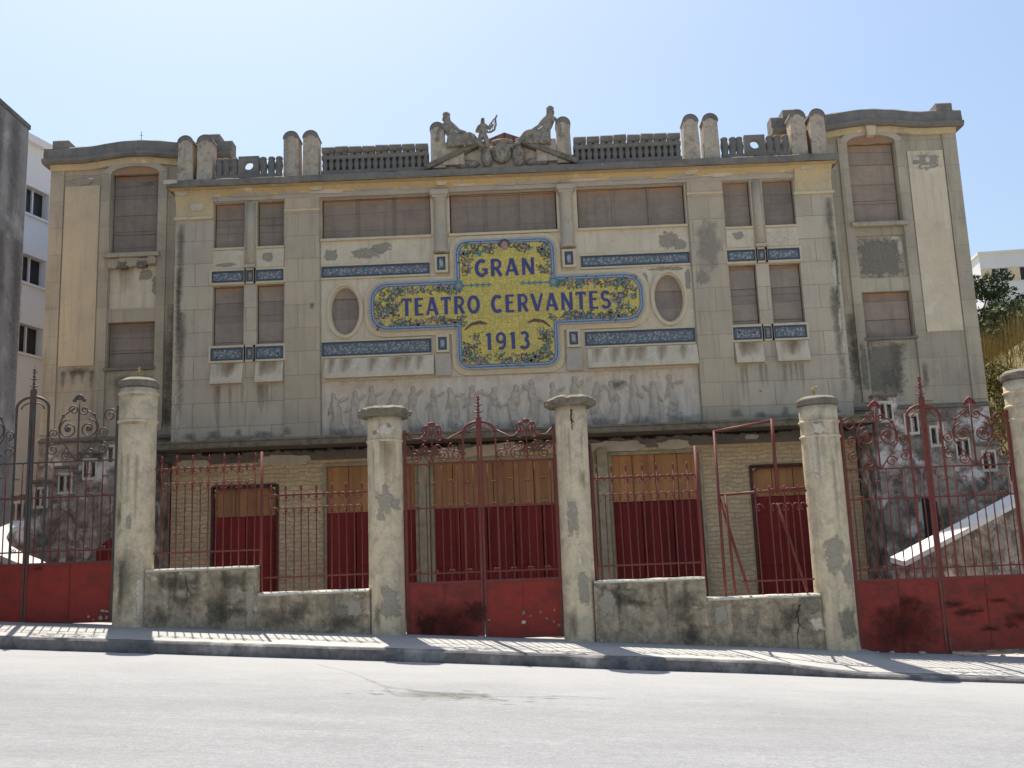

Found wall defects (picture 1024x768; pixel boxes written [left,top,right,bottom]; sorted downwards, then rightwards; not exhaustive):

peeling [910,153,938,170]
spalling [324,250,337,261]
spalling [352,242,390,259]
peeling [858,236,904,277]
damp [832,290,903,394]
spalling [375,484,400,520]
peeling [567,501,579,537]
spalling [824,535,854,590]